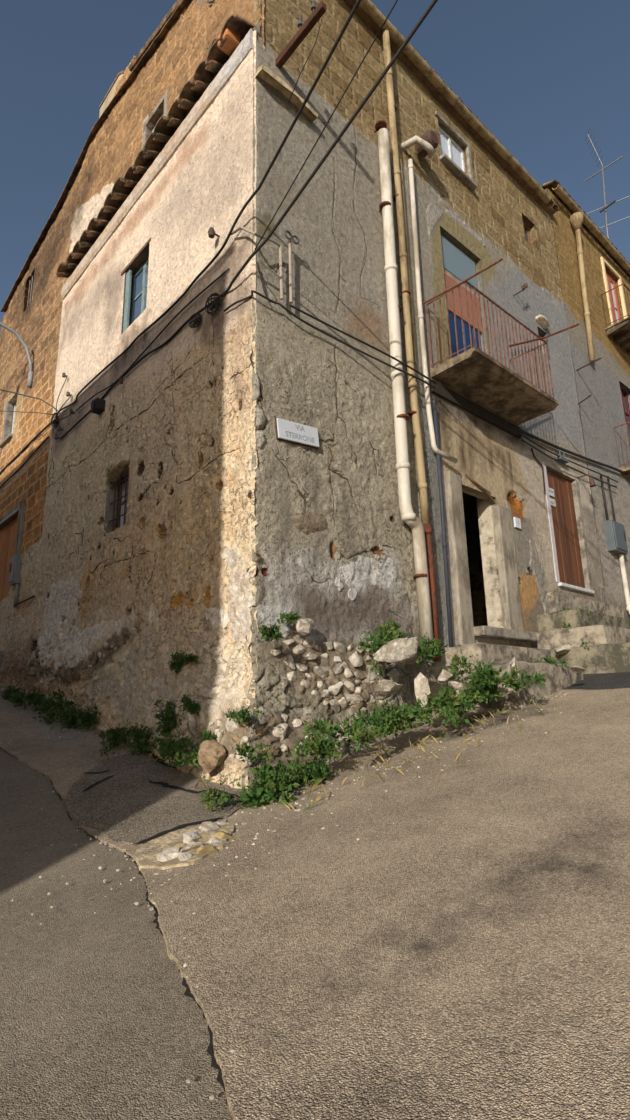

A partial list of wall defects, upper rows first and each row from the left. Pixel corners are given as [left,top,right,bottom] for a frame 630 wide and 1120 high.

crack [48,313,382,524]
spalling [137,454,182,551]
corrosion [508,498,523,520]
crack [67,516,156,586]
peeling [30,547,291,676]
crack [307,545,411,620]
peeling [330,543,398,601]